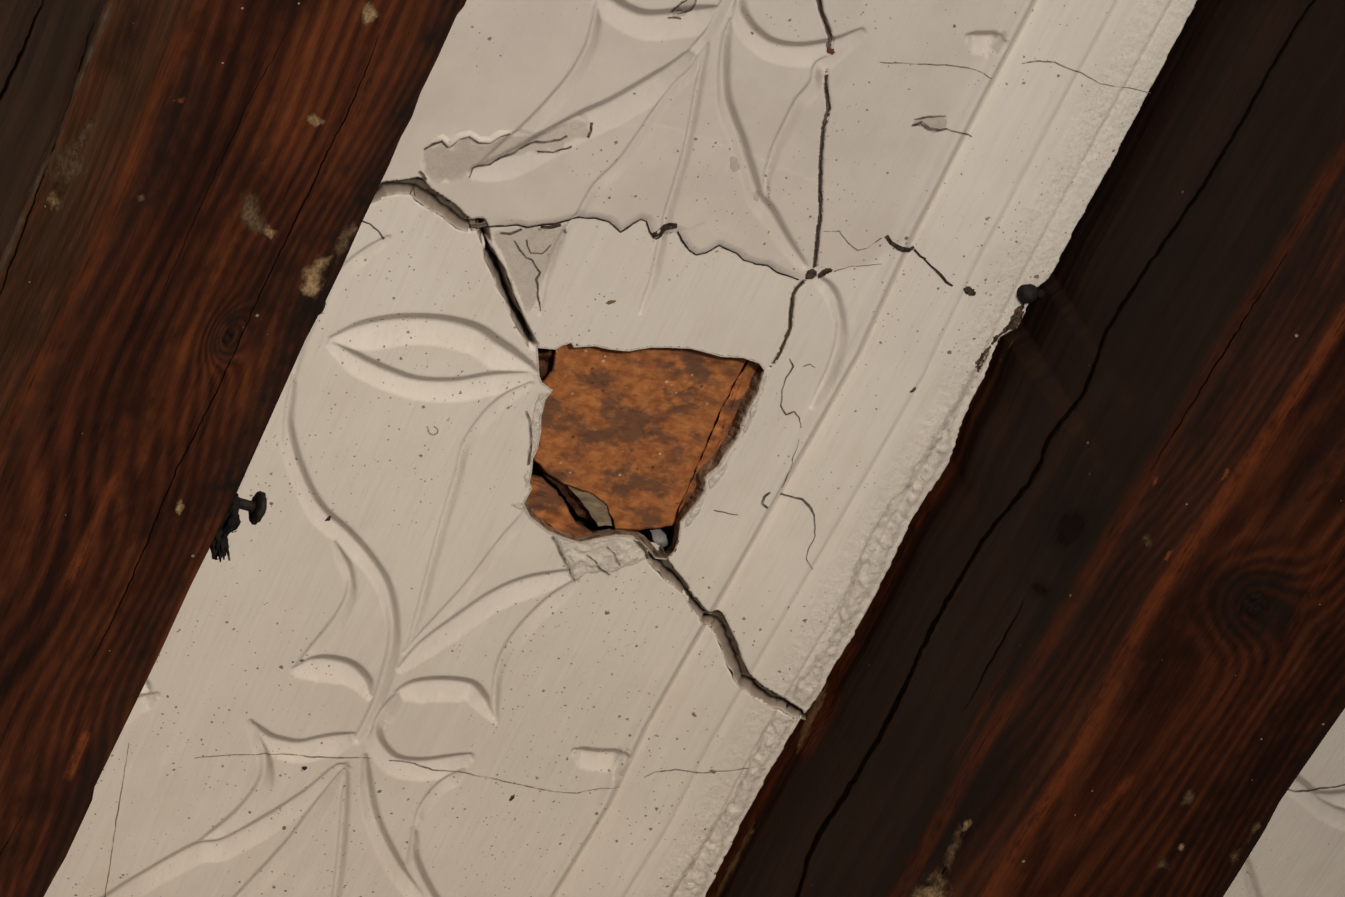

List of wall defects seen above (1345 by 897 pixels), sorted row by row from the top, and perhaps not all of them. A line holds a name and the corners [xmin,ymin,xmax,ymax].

crack [880,62,992,79]
crack [1023,60,1150,93]
peeling [424,130,512,150]
peeling [468,135,572,178]
crack [362,179,536,347]
crack [714,0,953,569]
spalling [975,303,1024,372]
flaking render [514,342,766,582]
crack [633,537,807,720]